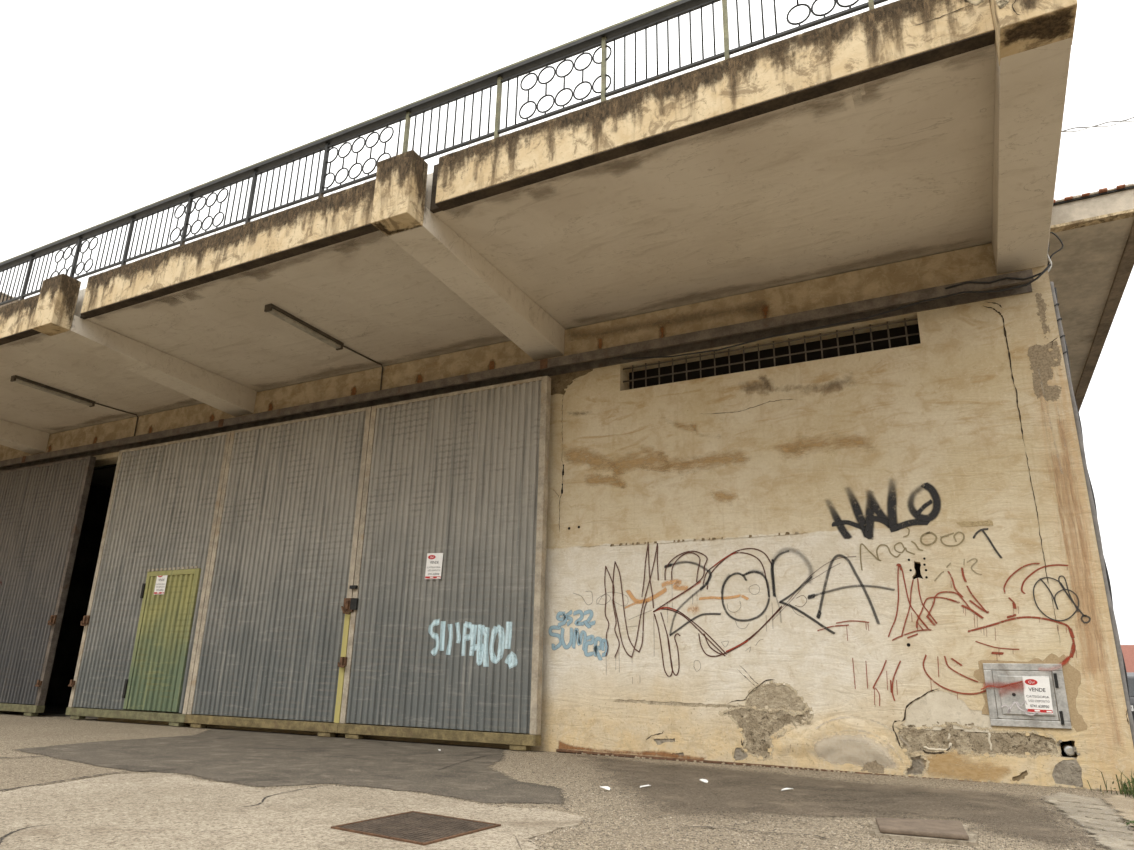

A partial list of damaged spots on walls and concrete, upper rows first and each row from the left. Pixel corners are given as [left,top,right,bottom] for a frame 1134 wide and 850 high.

damp [1004,0,1074,46]
damp [440,0,934,188]
damp [0,151,426,327]
damp [566,451,744,486]
crack [984,302,1060,637]
flaking render [613,681,814,761]
flaking render [894,721,1080,783]